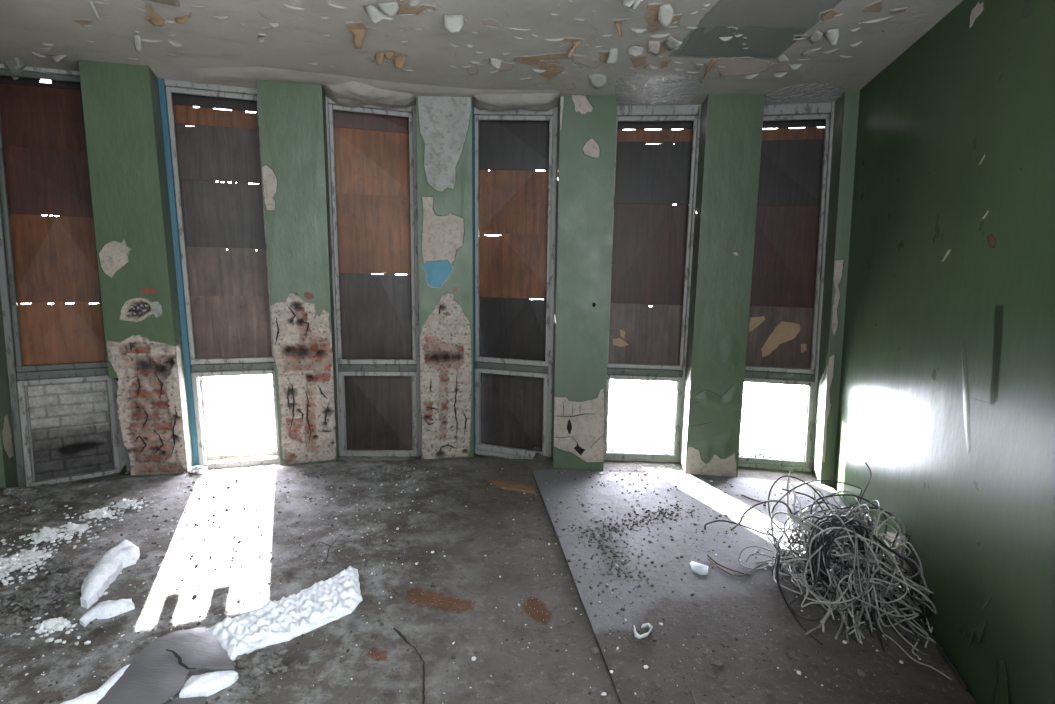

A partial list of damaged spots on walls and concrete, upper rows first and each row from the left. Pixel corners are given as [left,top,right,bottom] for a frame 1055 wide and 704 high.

peeling [969,0,985,29]
peeling [345,0,907,132]
peeling [262,164,278,211]
peeling [416,96,472,267]
peeling [98,239,131,279]
spalling [120,298,162,322]
spalling [107,335,191,475]
spalling [271,293,336,465]
spalling [420,293,472,459]
crack [554,404,603,444]
flaking render [554,388,605,475]
peeling [685,446,737,477]